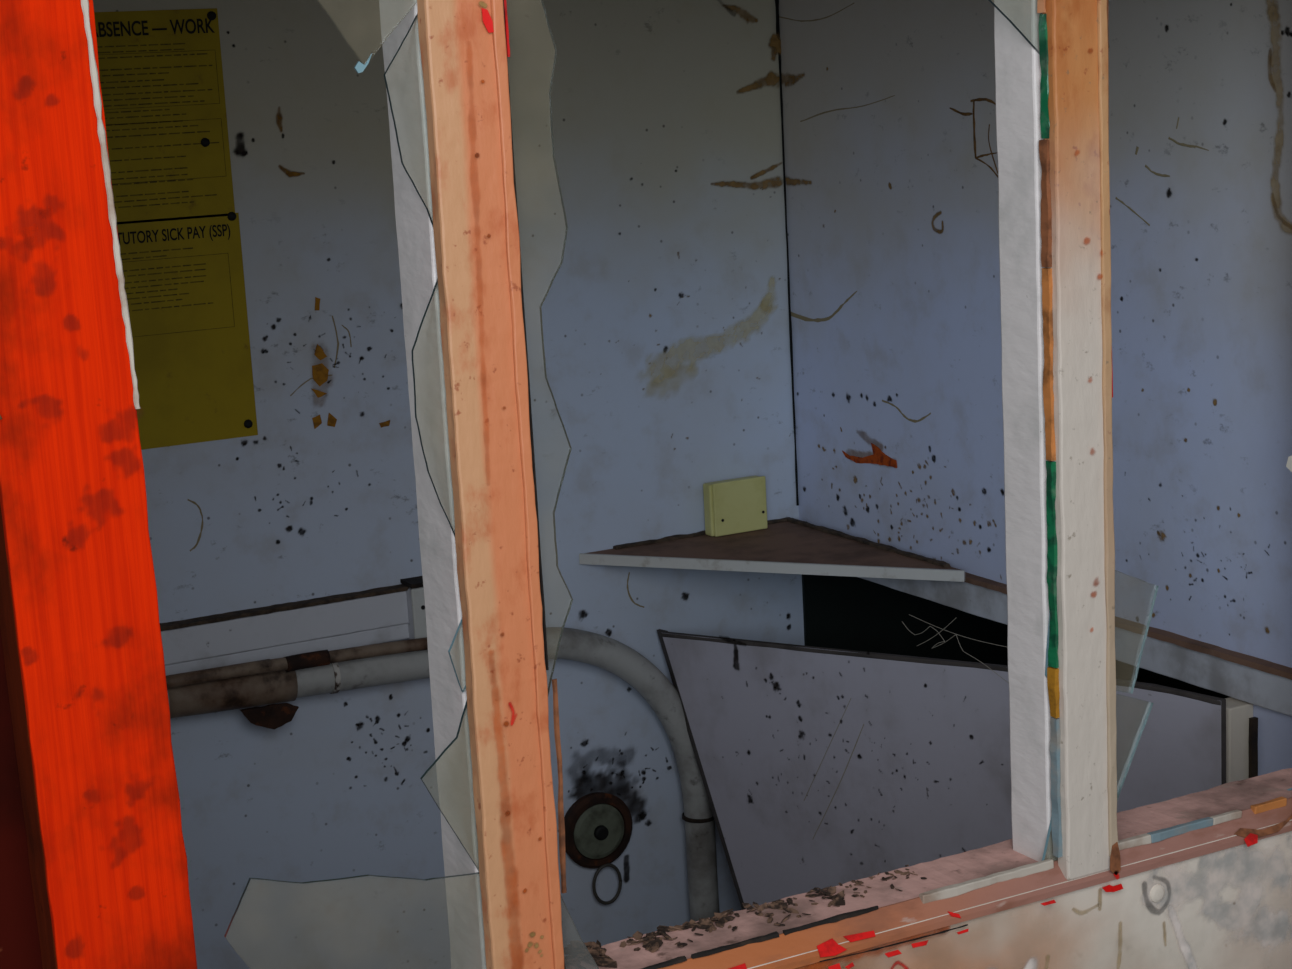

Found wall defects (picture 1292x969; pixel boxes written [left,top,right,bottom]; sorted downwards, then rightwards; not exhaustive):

crack [1135,117,1227,198]
crack [1115,197,1150,226]
crack [769,0,895,506]
rust [822,443,914,474]